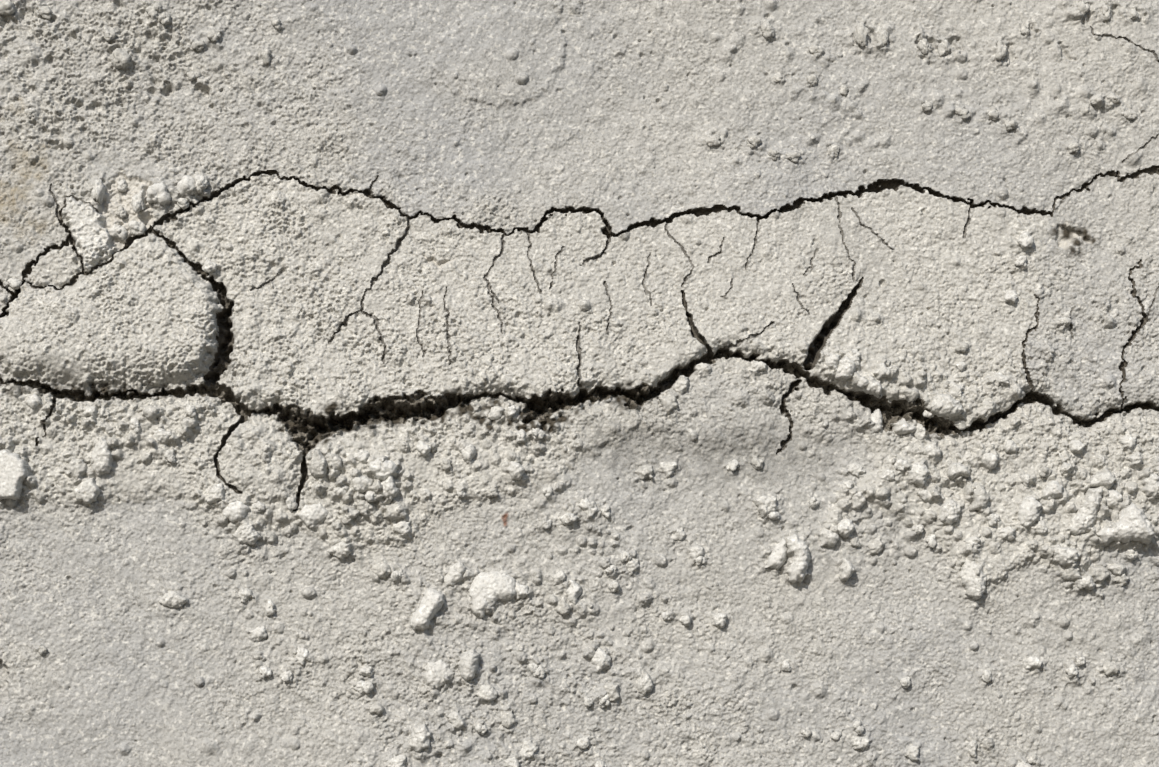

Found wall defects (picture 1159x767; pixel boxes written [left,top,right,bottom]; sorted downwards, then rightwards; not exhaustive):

crack [1090,26,1159,62]
crack [0,133,1159,511]